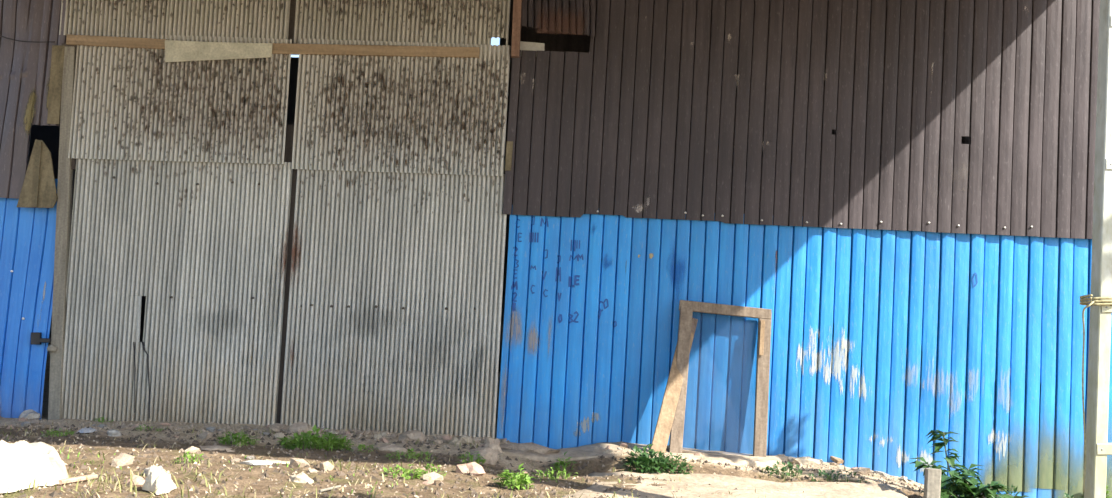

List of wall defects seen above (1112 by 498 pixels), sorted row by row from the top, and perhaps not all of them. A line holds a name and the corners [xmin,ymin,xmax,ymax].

peeling [796,329,866,399]